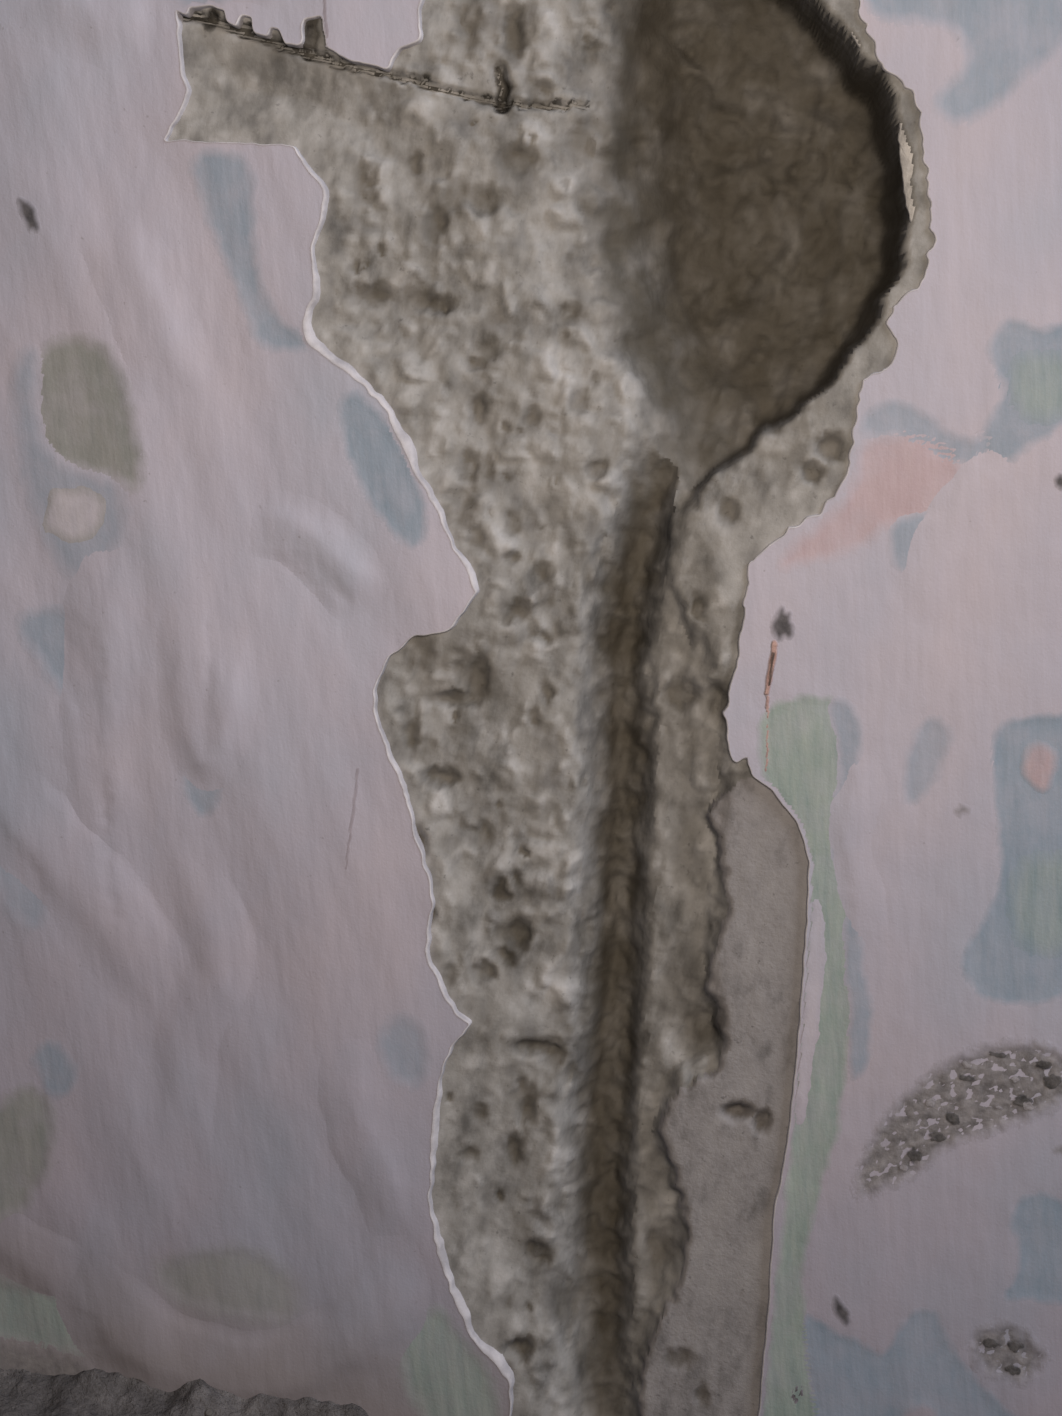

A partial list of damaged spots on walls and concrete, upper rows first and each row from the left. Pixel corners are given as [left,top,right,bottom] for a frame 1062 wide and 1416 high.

peeling [862,0,1062,131]
peeling [774,314,1062,574]
spalling [164,0,937,1416]
peeling [900,713,958,809]
spalling [847,1034,1062,1203]
peeling [964,1190,1062,1390]